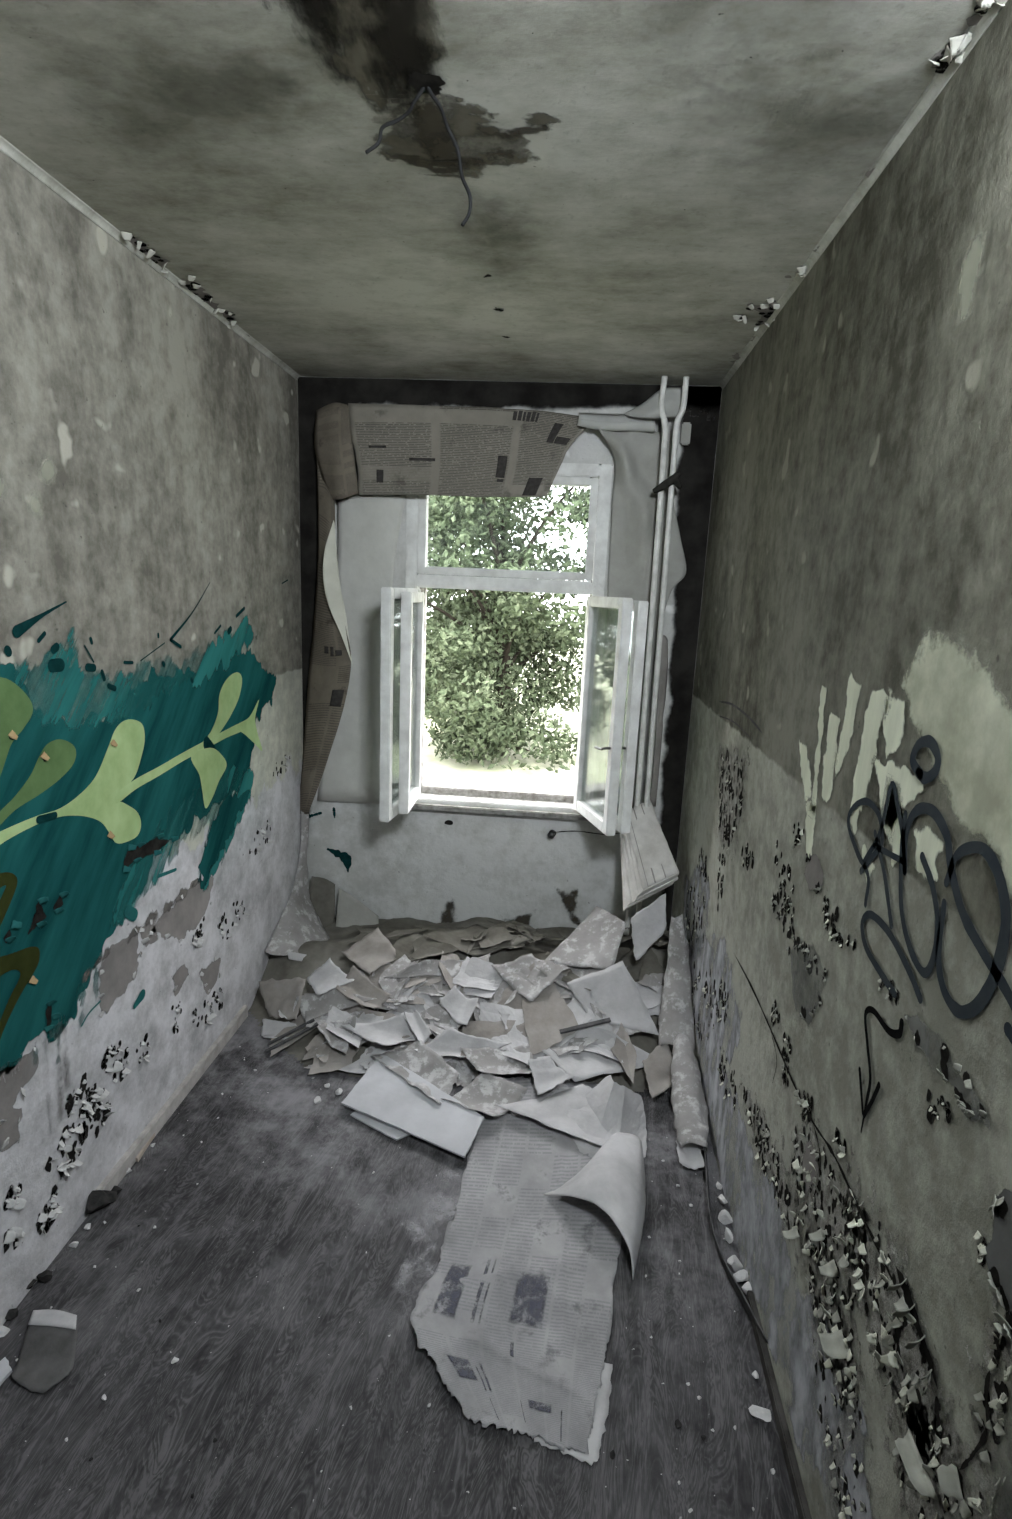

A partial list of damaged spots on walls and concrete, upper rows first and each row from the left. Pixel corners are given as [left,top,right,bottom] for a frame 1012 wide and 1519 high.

water stain [286,0,561,178]
spalling [929,0,1005,74]
peeling [4,891,70,943]
spalling [97,874,250,1034]
flaking render [273,377,1012,1519]